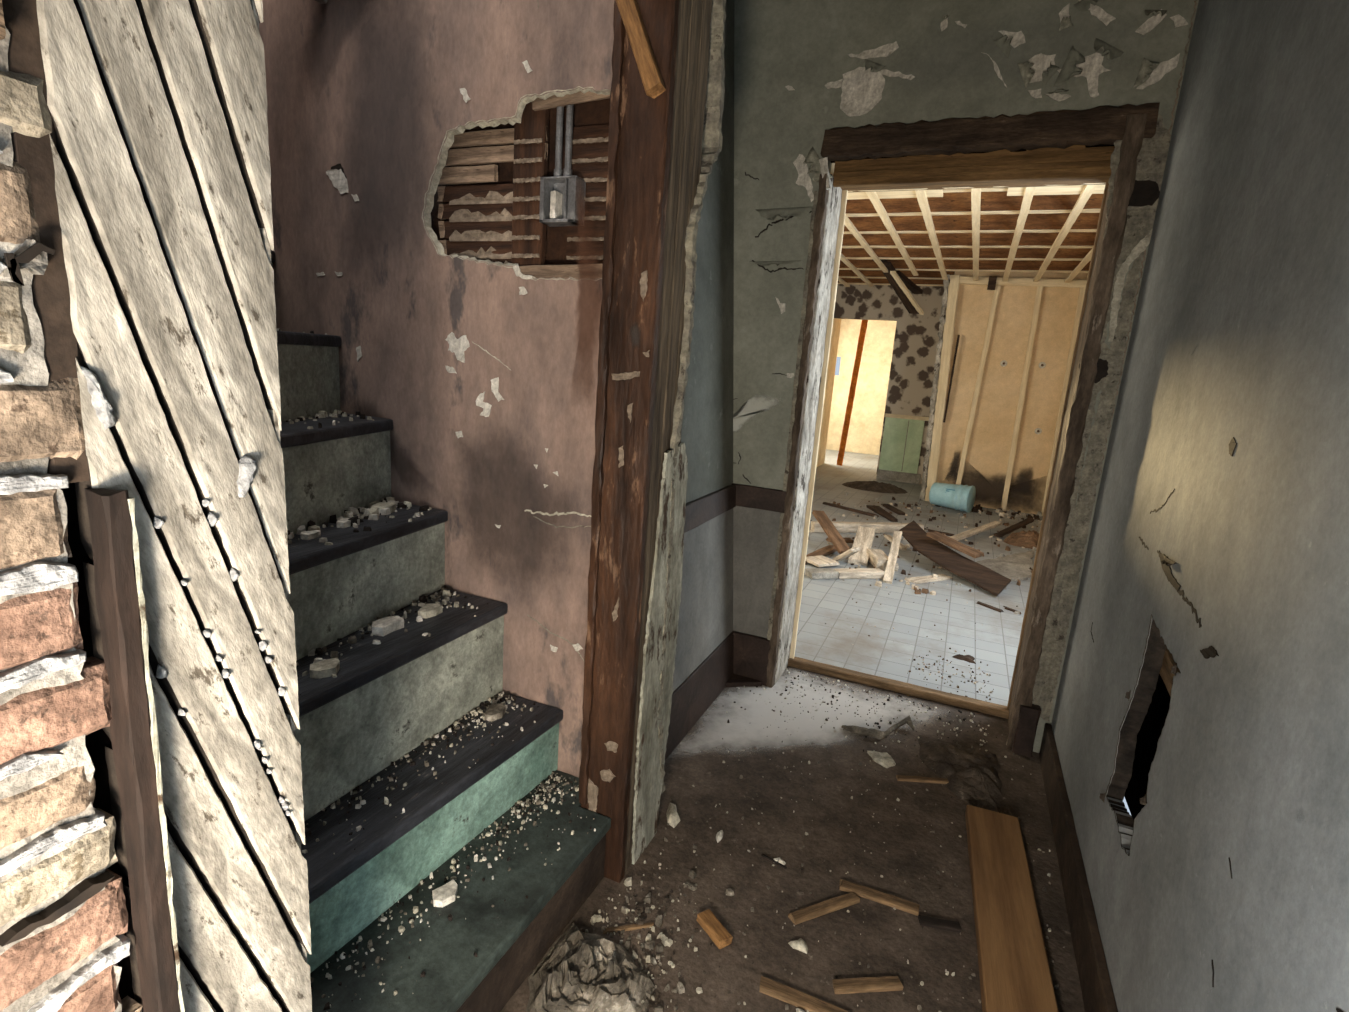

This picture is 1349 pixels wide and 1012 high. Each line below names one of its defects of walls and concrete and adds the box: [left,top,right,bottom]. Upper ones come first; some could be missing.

peeling [824,41,915,117]
peeling [984,0,1124,102]
flaking render [422,86,611,295]
flaking render [1032,0,1197,722]
crack [524,509,591,528]
spalling [1100,614,1181,856]